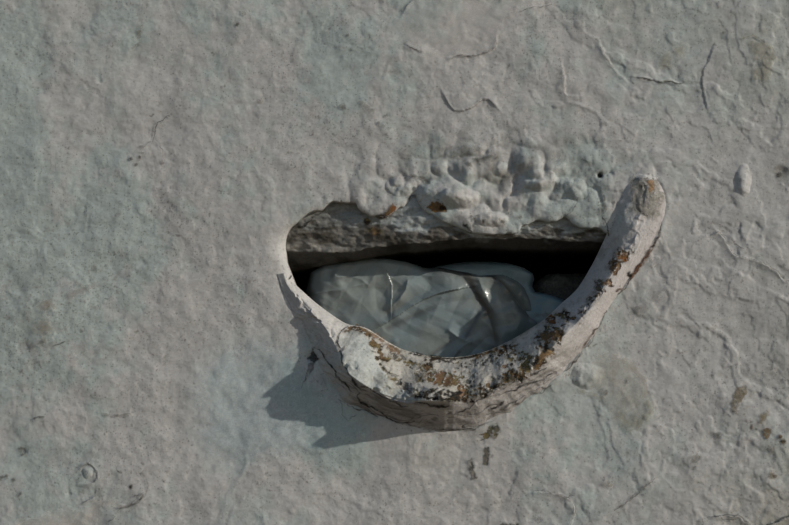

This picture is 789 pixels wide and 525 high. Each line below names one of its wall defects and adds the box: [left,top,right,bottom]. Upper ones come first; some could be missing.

flaking render [631,173,665,218]
peeling [344,249,633,399]